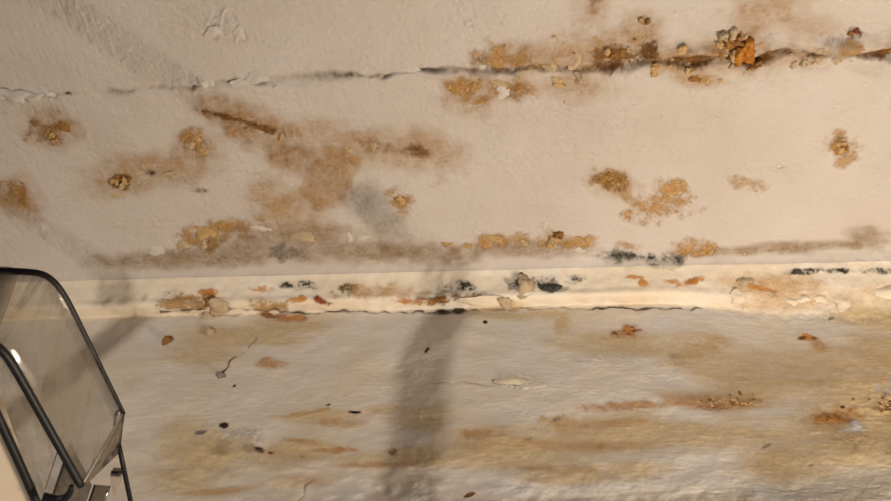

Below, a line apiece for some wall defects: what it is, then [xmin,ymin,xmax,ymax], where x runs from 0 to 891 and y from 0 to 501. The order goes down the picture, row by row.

crack [0,86,56,103]
crack [193,71,270,89]
crack [384,64,442,78]
crack [471,27,825,100]
spalling [109,166,131,199]
peeling [441,222,593,254]
crack [255,307,478,315]
crack [592,304,699,312]
water stain [785,294,891,328]
water stain [164,427,250,492]
water stain [446,417,753,482]
water stain [757,430,891,476]